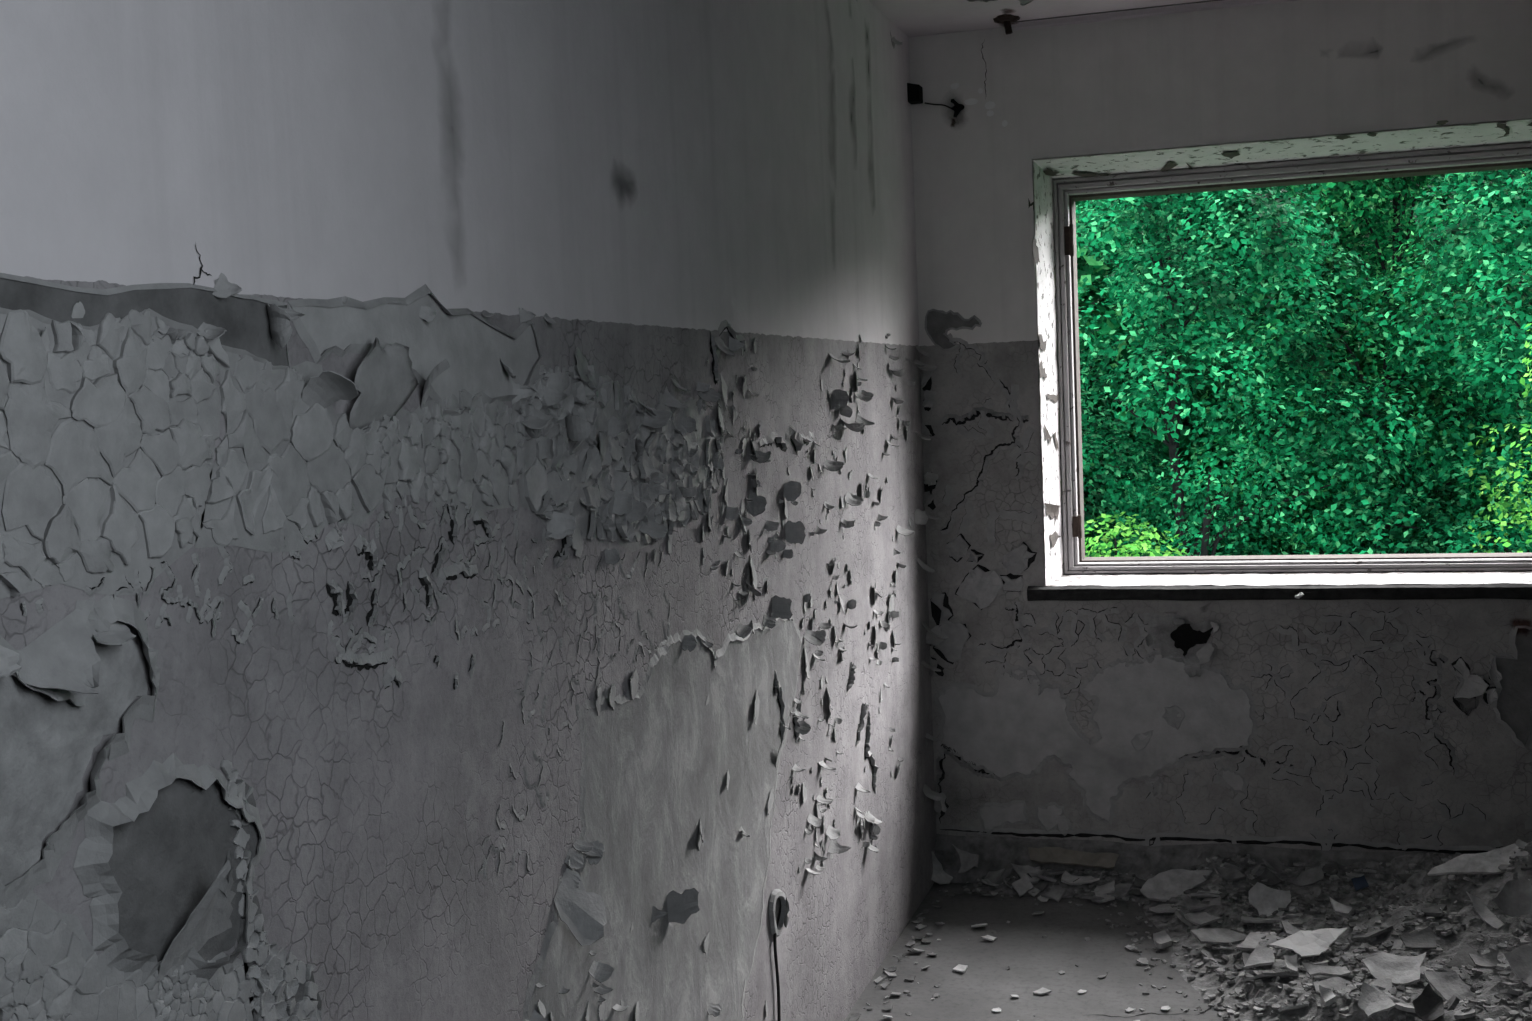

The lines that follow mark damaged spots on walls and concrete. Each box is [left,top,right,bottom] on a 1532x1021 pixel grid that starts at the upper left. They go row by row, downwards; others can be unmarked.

peeling [1043,168,1111,177]
peeling [1160,161,1193,171]
peeling [1032,237,1040,265]
peeling [1039,334,1059,403]
crack [939,333,1029,534]
peeling [0,273,982,1021]
flaking render [921,503,1258,826]
peeling [1451,625,1532,749]